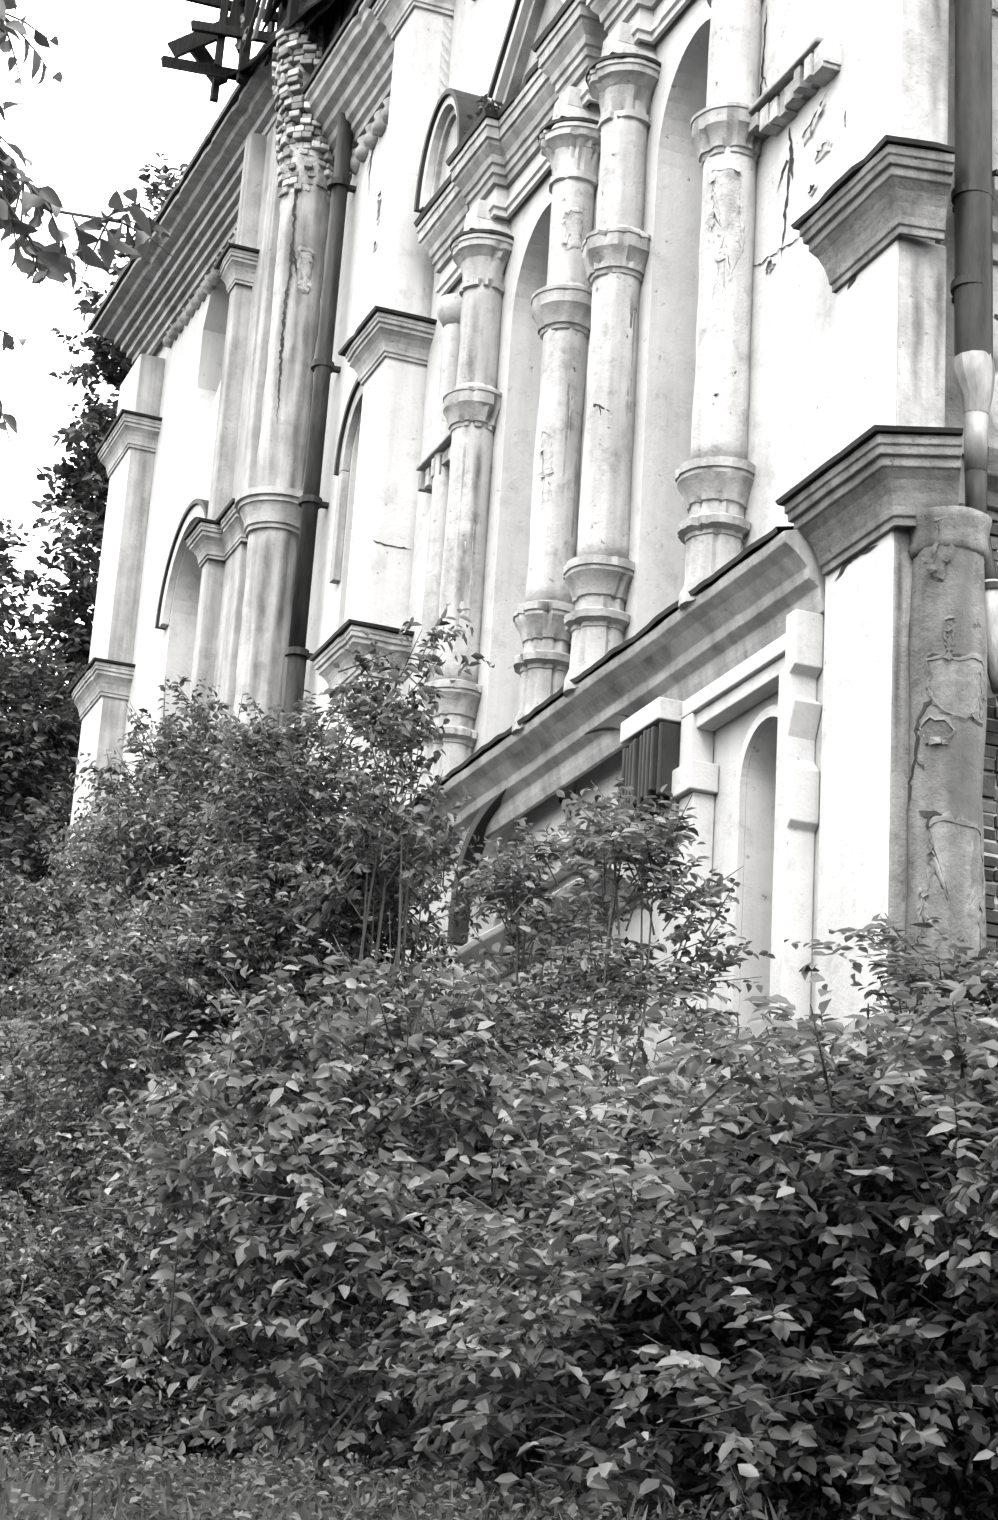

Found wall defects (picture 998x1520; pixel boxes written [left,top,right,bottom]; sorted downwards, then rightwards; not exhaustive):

spalling [925,517,957,582]
spalling [919,616,986,746]
spalling [915,811,986,1024]